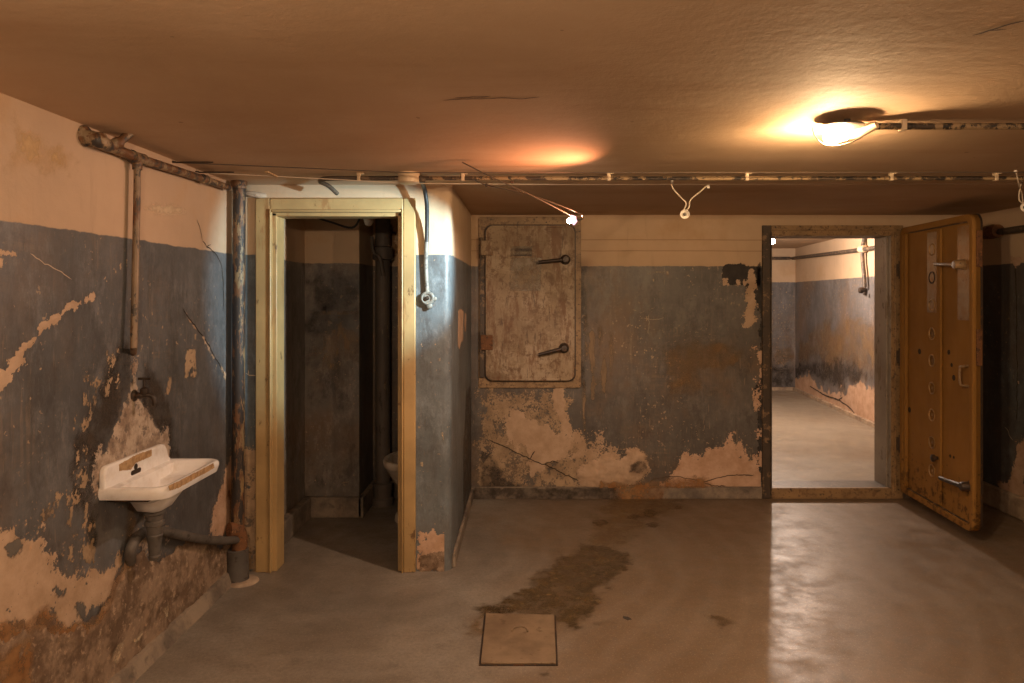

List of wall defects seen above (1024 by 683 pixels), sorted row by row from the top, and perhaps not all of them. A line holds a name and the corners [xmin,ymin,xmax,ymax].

crack [197,220,224,307]
peeling [722,266,760,328]
crack [183,309,256,379]
crack [490,440,577,480]
peeling [472,386,621,487]
peeling [659,345,762,487]
water stain [722,263,866,482]
crack [810,386,854,413]
flaking render [0,348,231,683]
peeling [417,528,444,572]
water stain [478,546,629,629]